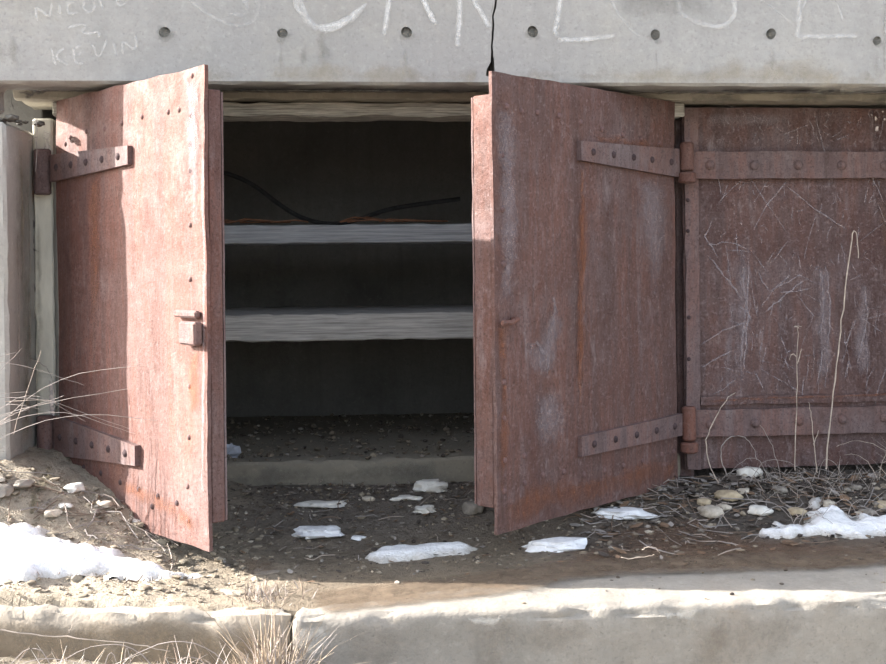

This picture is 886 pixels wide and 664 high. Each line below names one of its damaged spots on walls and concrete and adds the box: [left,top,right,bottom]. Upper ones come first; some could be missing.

crack [489,0,497,71]